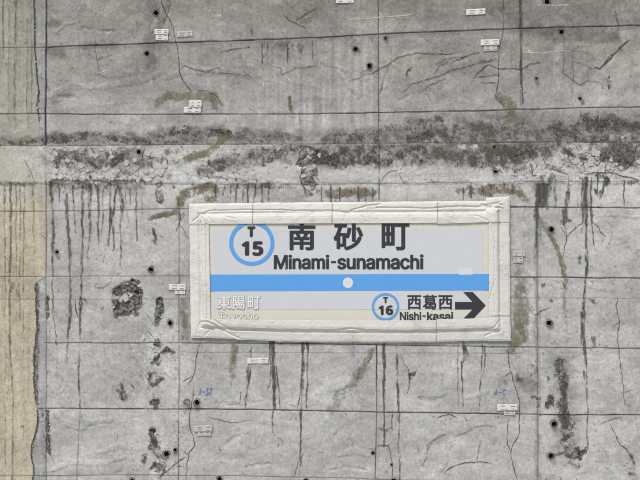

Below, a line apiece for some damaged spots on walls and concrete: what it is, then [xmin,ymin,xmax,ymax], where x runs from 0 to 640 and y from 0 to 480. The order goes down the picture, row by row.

crack [349,22,540,107]
crack [562,11,630,92]
damp [0,131,137,259]
rust [153,182,218,218]
spalling [297,145,321,195]
damp [312,113,640,378]
spalling [111,279,143,318]
rust [511,283,528,351]
spalling [141,426,166,472]
damp [269,341,280,425]
crack [507,354,520,479]
damp [531,358,589,468]